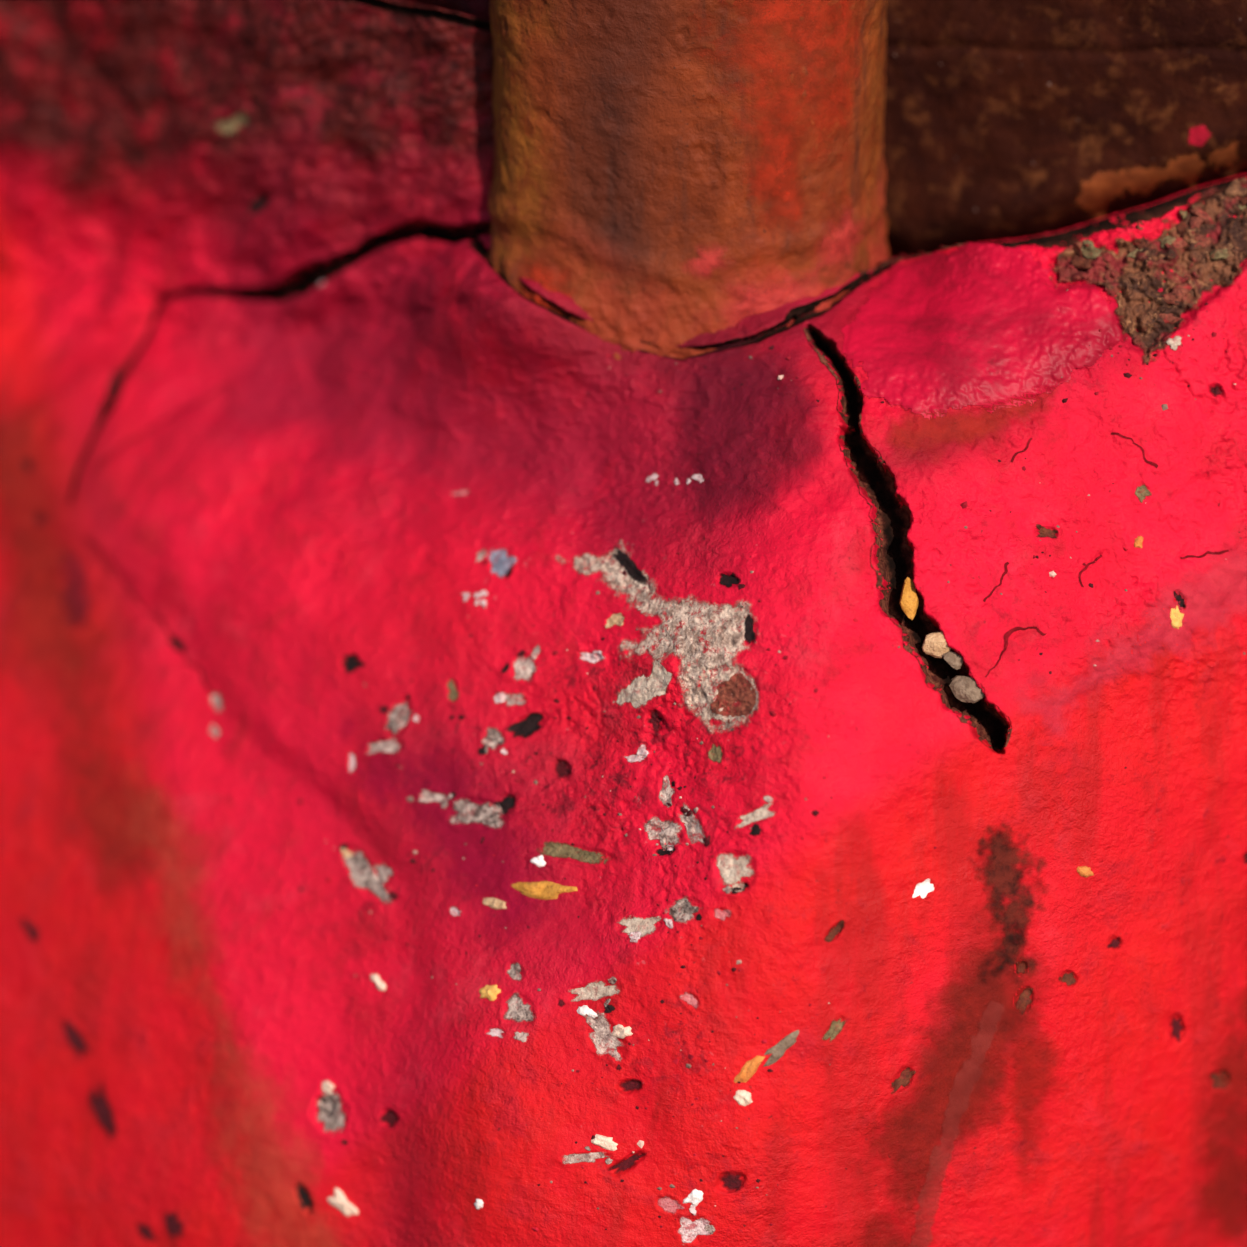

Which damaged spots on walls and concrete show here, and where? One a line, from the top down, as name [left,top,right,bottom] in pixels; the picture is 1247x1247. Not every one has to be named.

spalling [1052,178,1247,363]
crack [38,221,597,504]
crack [636,175,1247,751]
peeling [478,645,543,755]
spalling [556,540,759,763]
peeling [644,776,753,894]
peeling [620,898,731,942]
peeling [479,963,533,1042]
peeling [559,977,641,1091]
peeling [733,1030,799,1106]
peeling [562,1134,645,1172]
peeling [658,1189,715,1243]